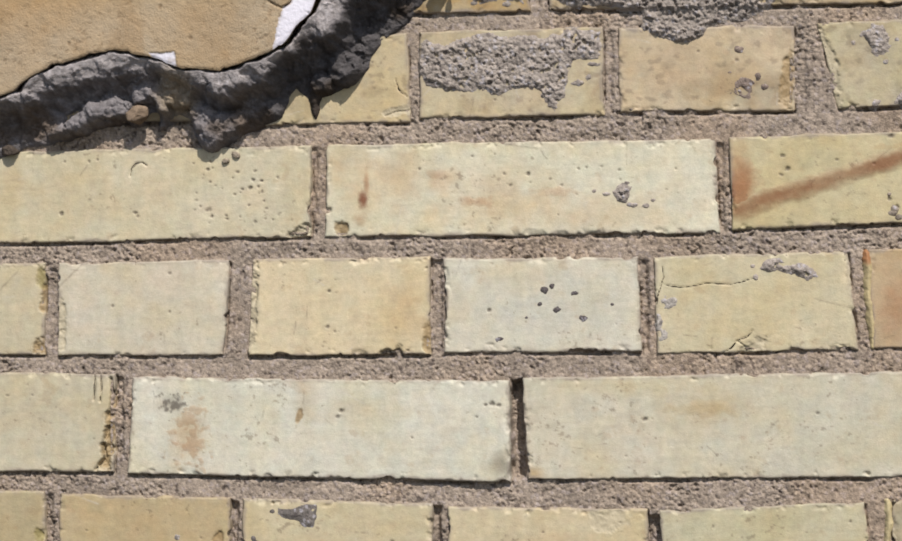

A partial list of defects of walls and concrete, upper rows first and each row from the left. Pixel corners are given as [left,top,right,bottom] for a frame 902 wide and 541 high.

flaking render [0,0,426,164]
peeling [571,62,600,86]
rust [732,142,902,228]